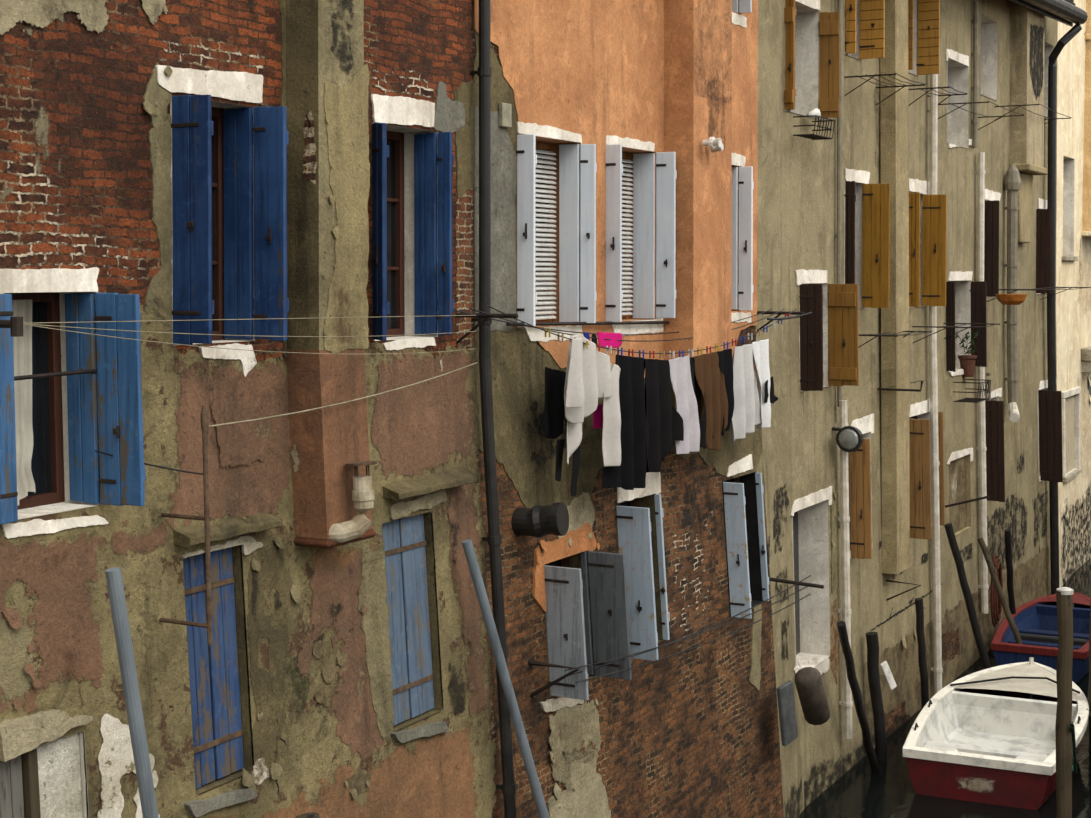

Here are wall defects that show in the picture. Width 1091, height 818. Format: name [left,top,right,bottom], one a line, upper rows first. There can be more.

peeling [0,0,109,35]
peeling [140,0,168,25]
water stain [330,0,354,74]
peeling [143,62,173,131]
peeling [303,64,370,353]
peeling [532,492,600,612]
peeling [0,607,42,711]
peeling [242,535,302,790]
peeling [97,714,143,818]
peeling [149,753,158,788]